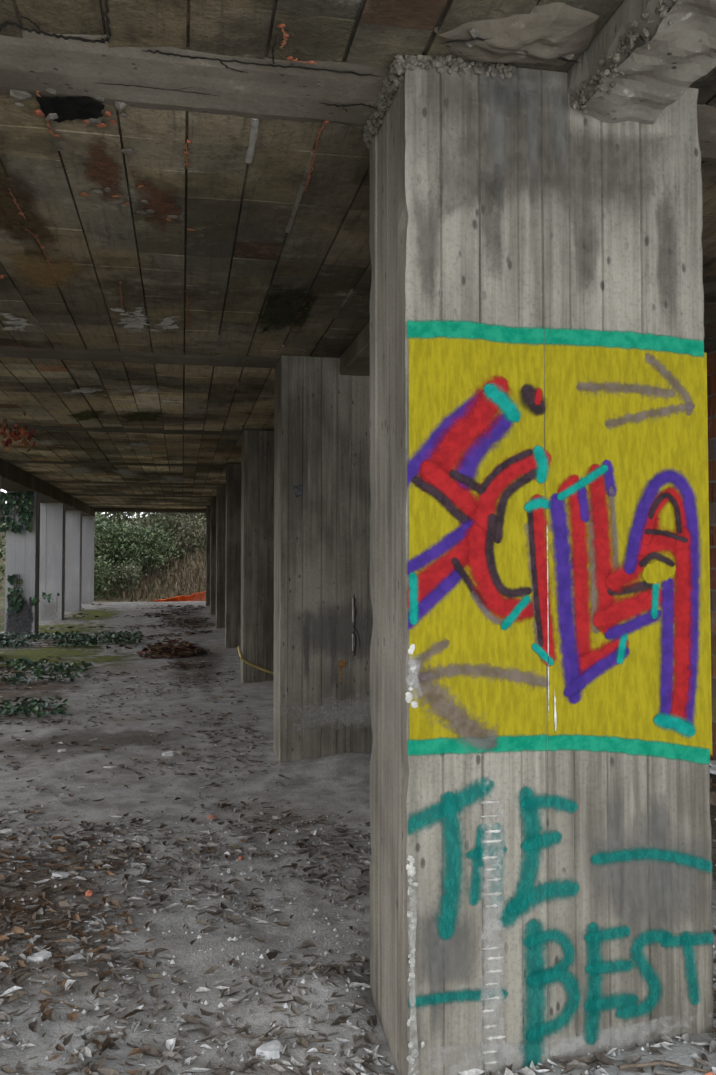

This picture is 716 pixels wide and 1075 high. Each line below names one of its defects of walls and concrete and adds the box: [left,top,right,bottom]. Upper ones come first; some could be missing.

crack [141,33,382,77]
spalling [570,0,682,114]
spalling [10,88,128,138]
crack [99,83,217,96]
water stain [0,155,80,287]
water stain [260,287,316,332]